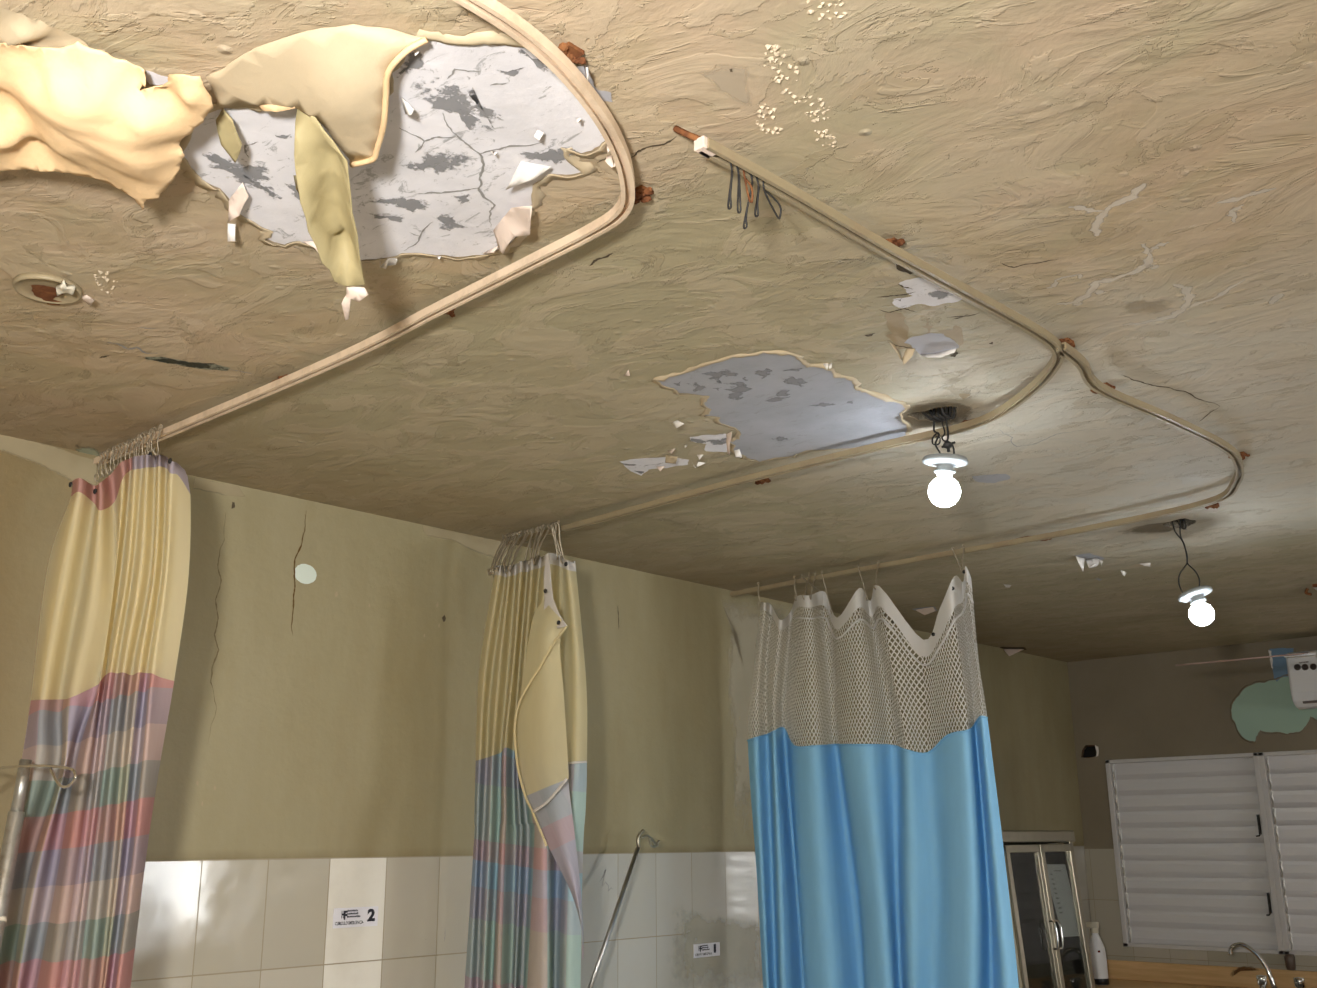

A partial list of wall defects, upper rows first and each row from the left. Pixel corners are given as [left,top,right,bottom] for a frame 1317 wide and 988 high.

peeling [0,8,616,320]
crack [100,327,251,374]
peeling [865,264,978,365]
peeling [620,350,913,476]
crack [208,513,226,741]
crack [291,515,306,635]
peeling [1230,648,1317,744]